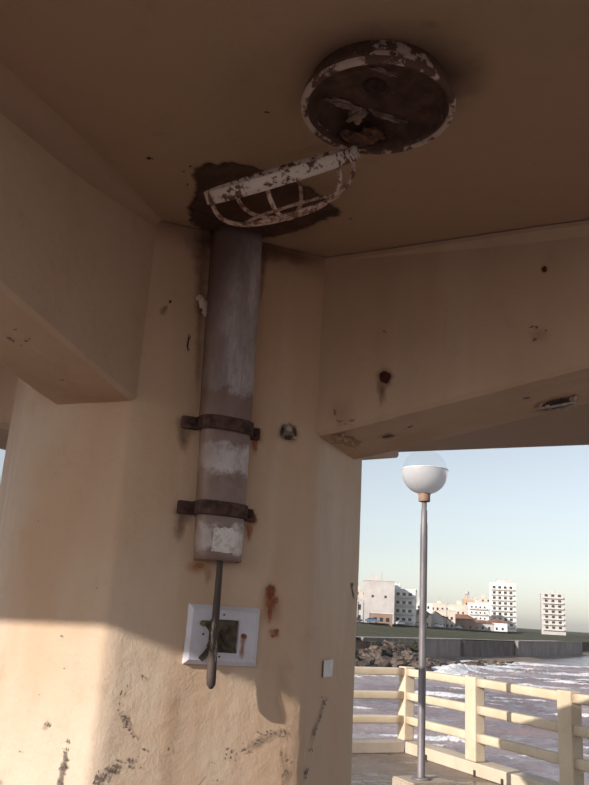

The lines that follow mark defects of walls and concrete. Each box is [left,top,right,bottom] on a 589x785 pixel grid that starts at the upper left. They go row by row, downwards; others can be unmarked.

rust [267,586,278,620]